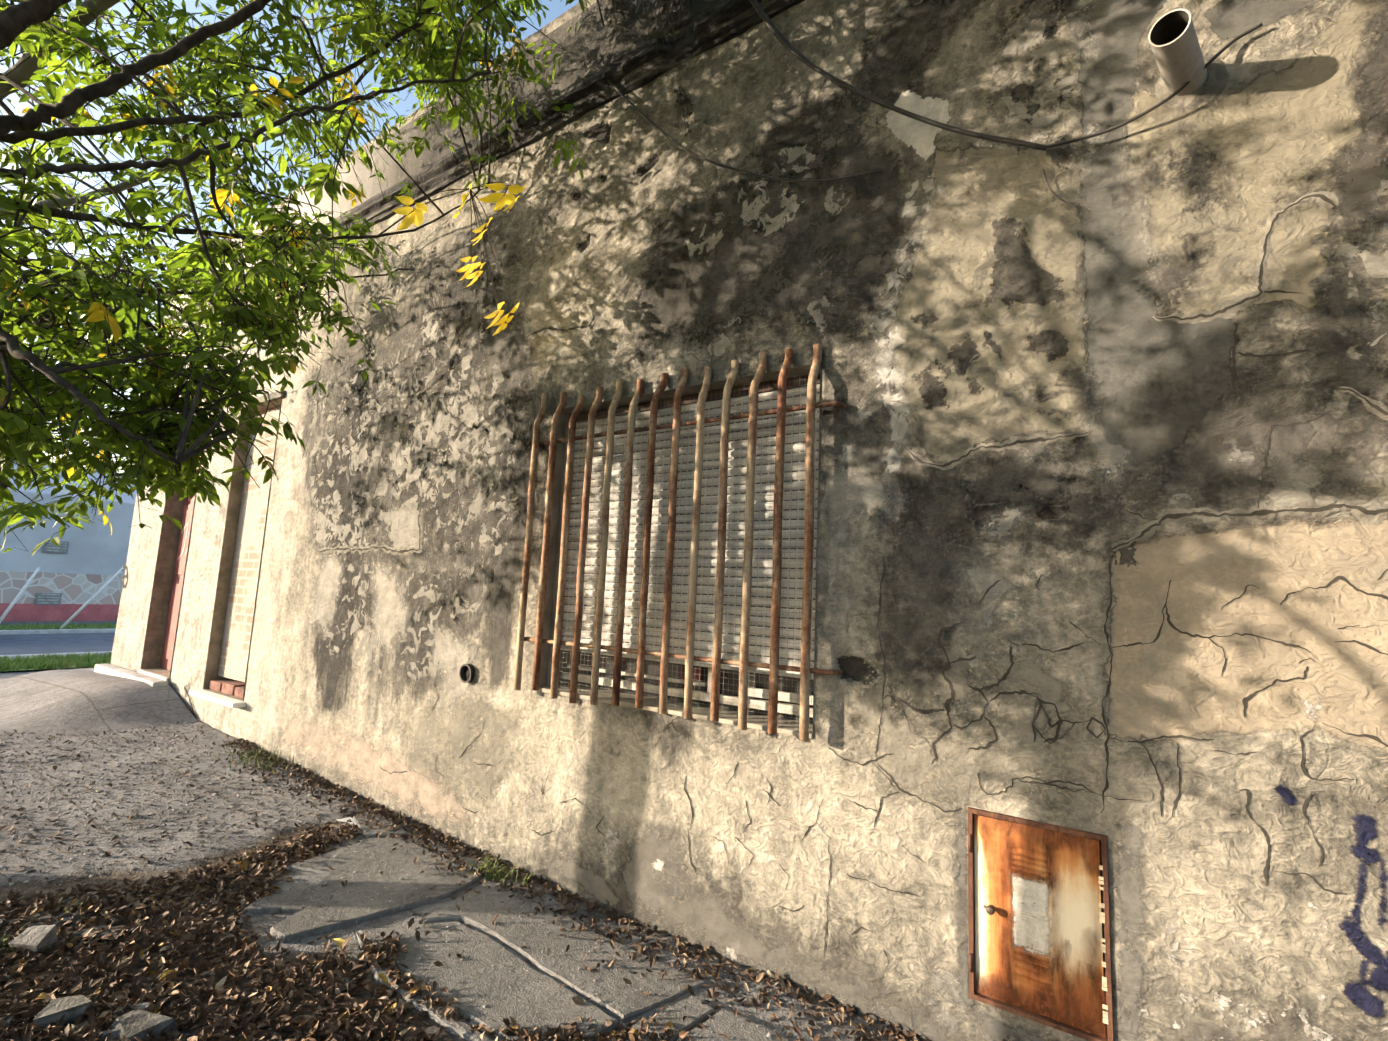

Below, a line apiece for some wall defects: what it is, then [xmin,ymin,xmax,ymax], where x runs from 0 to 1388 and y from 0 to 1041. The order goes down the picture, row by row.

peeling [686,142,818,257]
water stain [637,0,986,359]
peeling [886,90,952,217]
peeling [868,231,927,351]
water stain [823,0,1388,688]
crack [1153,190,1339,392]
peeling [1331,243,1388,306]
peeling [307,303,519,686]
crack [684,386,1388,971]
crack [531,771,627,869]
rust [1005,822,1099,891]
rust [975,915,1106,1034]